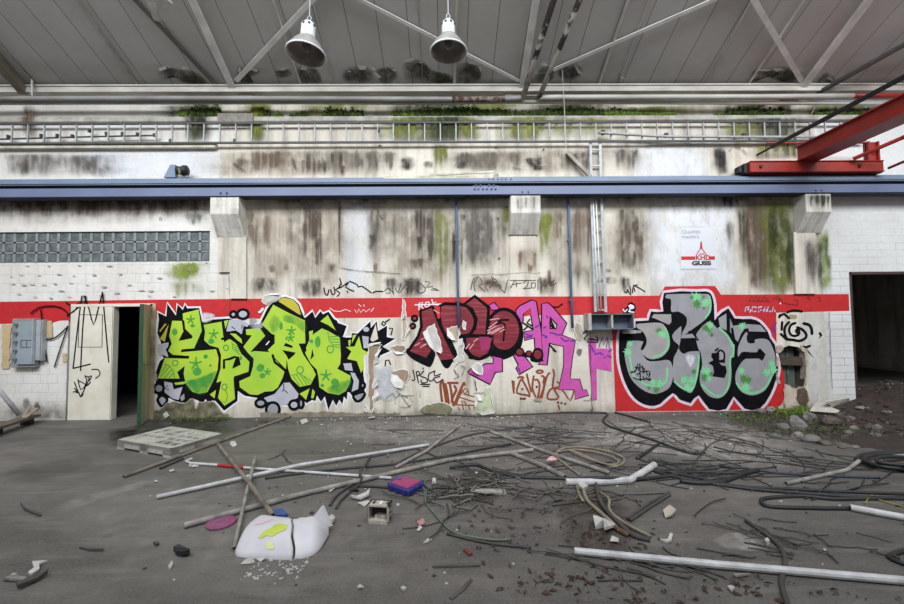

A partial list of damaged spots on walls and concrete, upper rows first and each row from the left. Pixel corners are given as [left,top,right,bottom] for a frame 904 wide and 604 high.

water stain [254,151,411,172]
water stain [426,147,576,169]
water stain [715,146,746,172]
water stain [304,208,340,263]
water stain [394,211,440,267]
water stain [443,211,492,263]
water stain [621,210,643,265]
water stain [387,278,420,294]
peeling [423,320,483,375]
peeling [419,402,453,415]
peeling [474,386,495,413]
spalling [776,345,810,409]